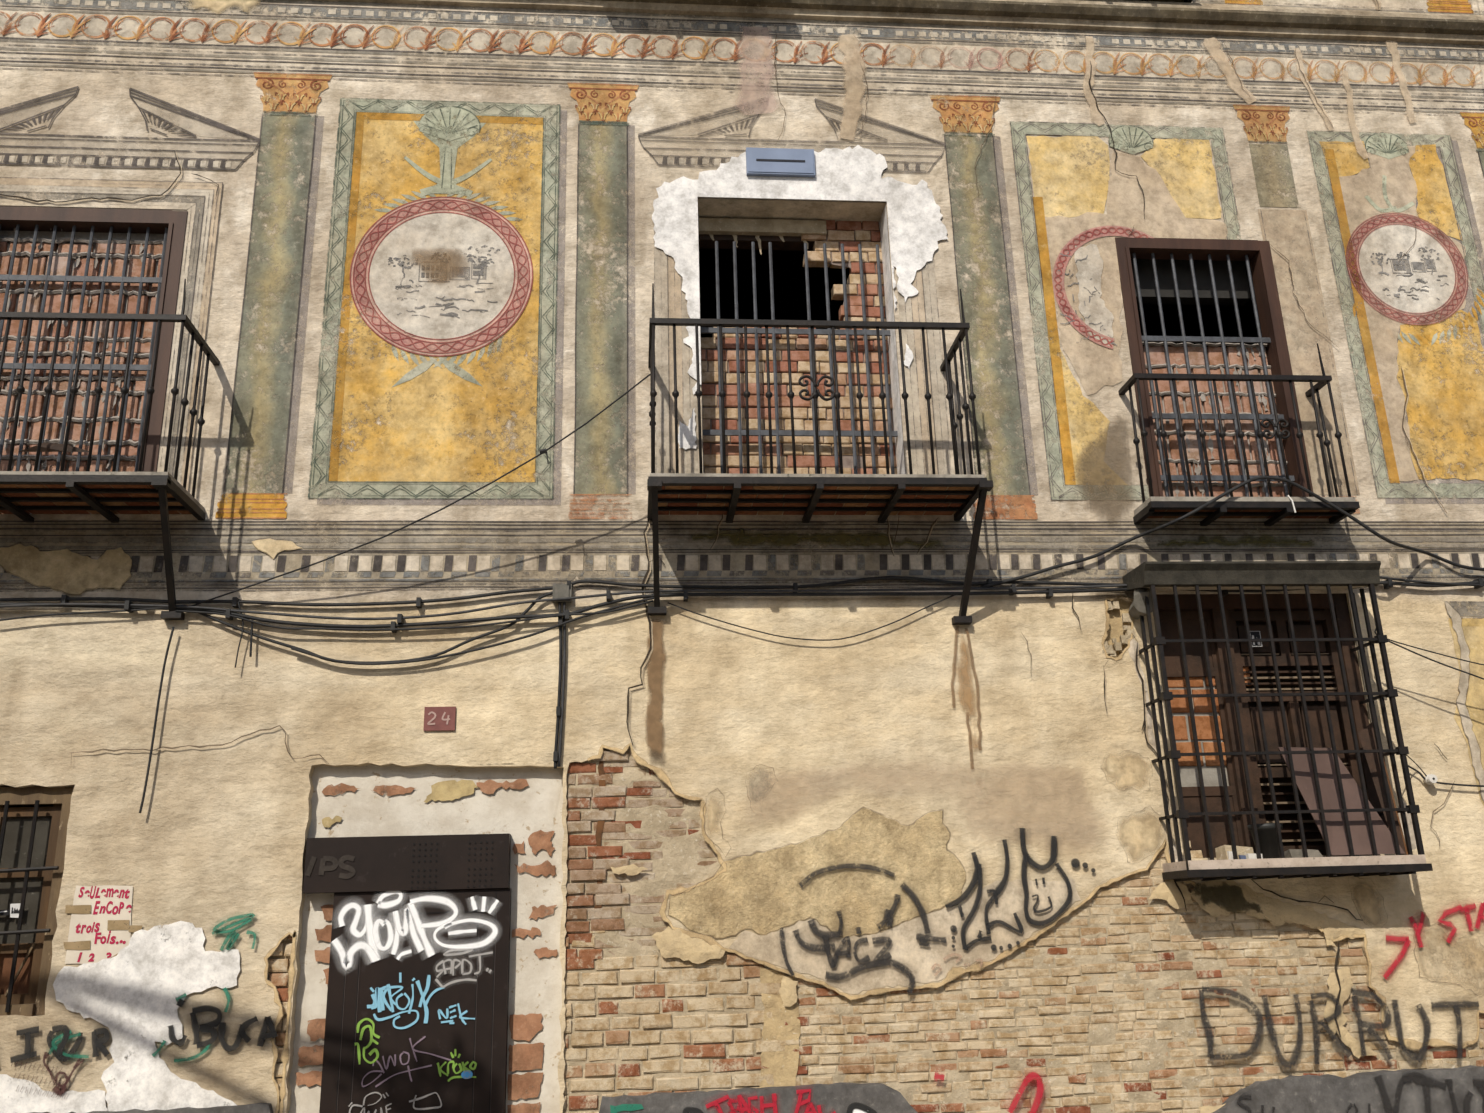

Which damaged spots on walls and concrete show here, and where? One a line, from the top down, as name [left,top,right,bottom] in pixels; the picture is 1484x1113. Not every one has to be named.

crack [1088,61,1145,237]
peeling [904,344,913,370]
peeling [678,408,697,449]
peeling [0,544,132,595]
rust [646,620,665,761]
rust [951,626,982,769]
crack [72,725,329,764]
peeling [322,779,529,803]
peeling [322,816,342,828]
spalling [507,743,1484,1113]